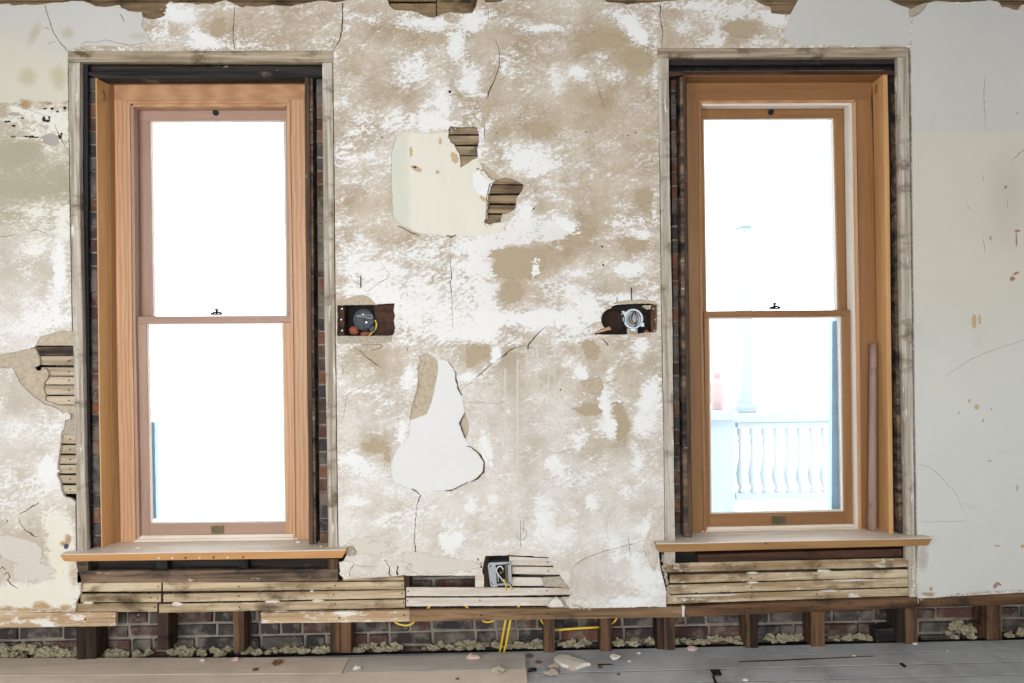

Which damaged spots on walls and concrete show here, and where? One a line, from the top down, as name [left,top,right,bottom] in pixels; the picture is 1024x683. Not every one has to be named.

crack [45,6,144,51]
crack [487,42,500,96]
crack [447,235,456,328]
flaking render [0,330,75,435]
flaking render [410,353,438,420]
flaking render [461,414,469,438]
crack [446,327,545,491]
flaking render [339,546,356,573]
crack [349,489,421,576]
flaking render [399,551,483,575]
flaking render [541,570,591,610]
crack [574,537,647,567]